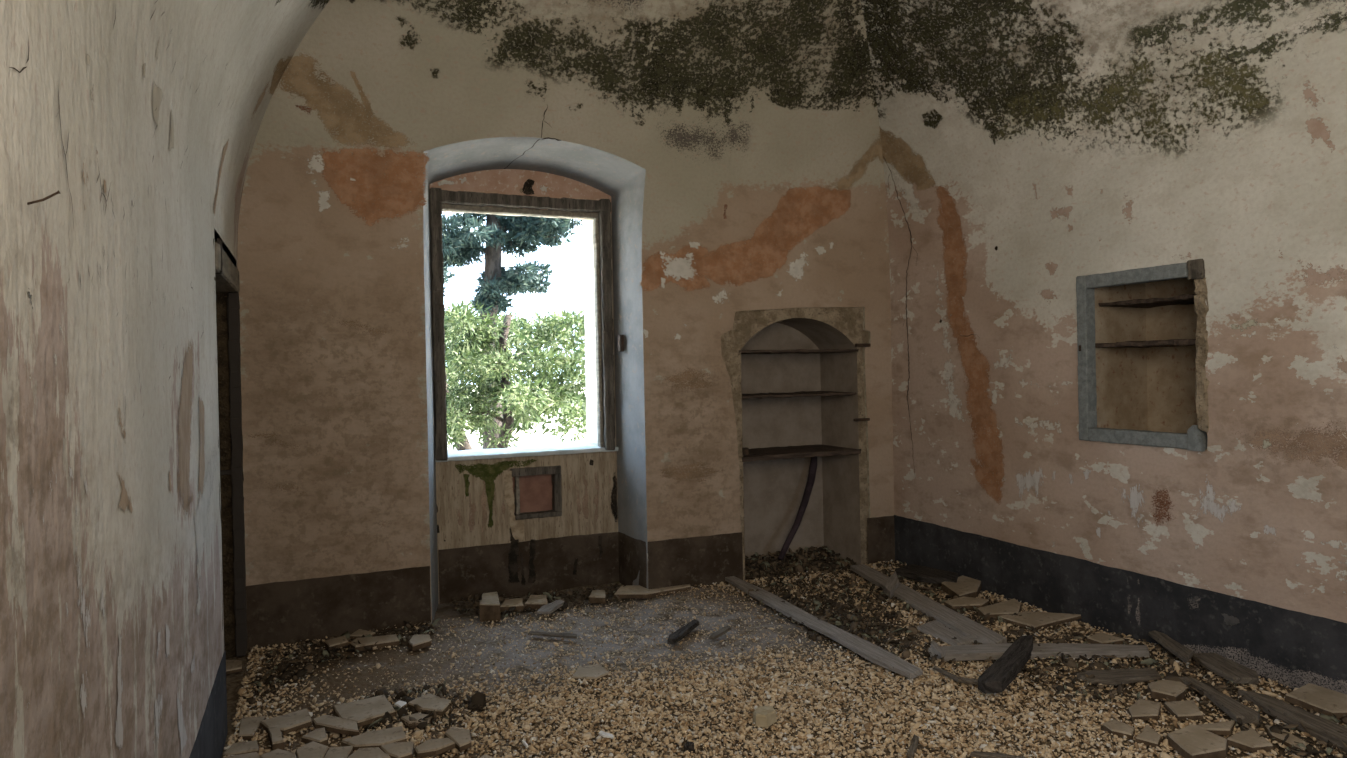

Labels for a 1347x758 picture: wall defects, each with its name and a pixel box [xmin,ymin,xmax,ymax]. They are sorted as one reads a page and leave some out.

damp [269,52,430,226]
peeling [304,151,331,212]
peeling [660,241,700,289]
peeling [777,241,834,298]
damp [380,0,1347,505]
peeling [1279,250,1345,286]
peeling [168,342,205,518]
peeling [119,477,133,513]
damp [463,474,495,528]
damp [610,472,618,522]
peeling [1114,484,1147,528]
damp [507,528,536,585]